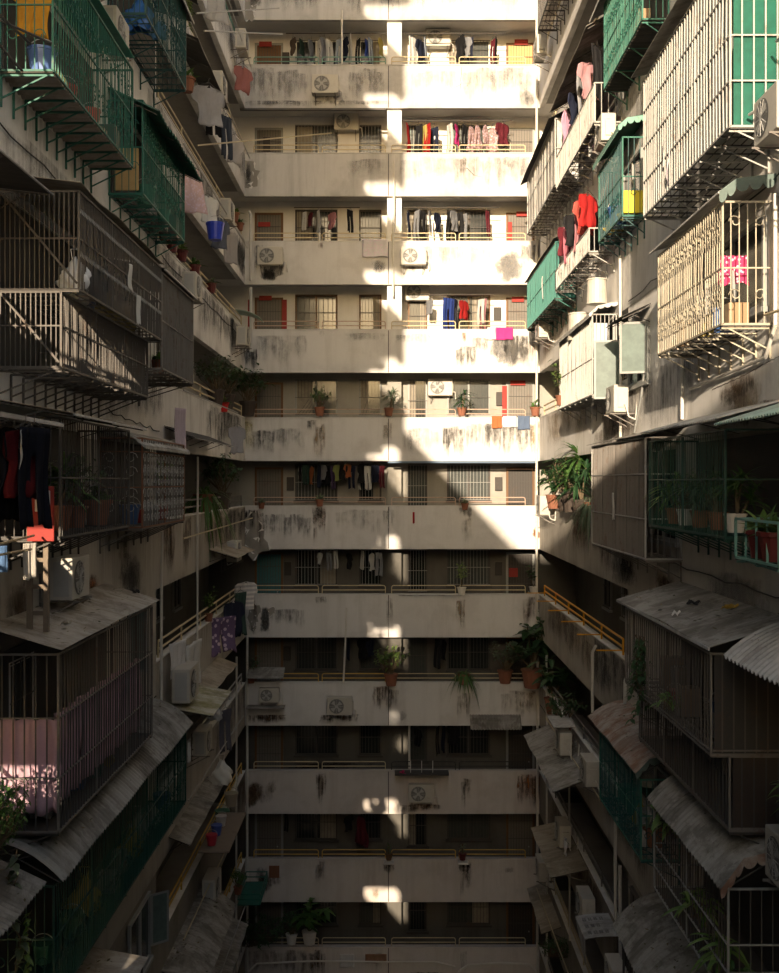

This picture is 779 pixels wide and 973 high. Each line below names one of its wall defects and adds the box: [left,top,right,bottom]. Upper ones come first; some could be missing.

leakage [496,253,522,281]
leakage [456,337,528,366]
leakage [443,428,473,448]
leakage [485,424,531,443]
leakage [252,606,269,630]